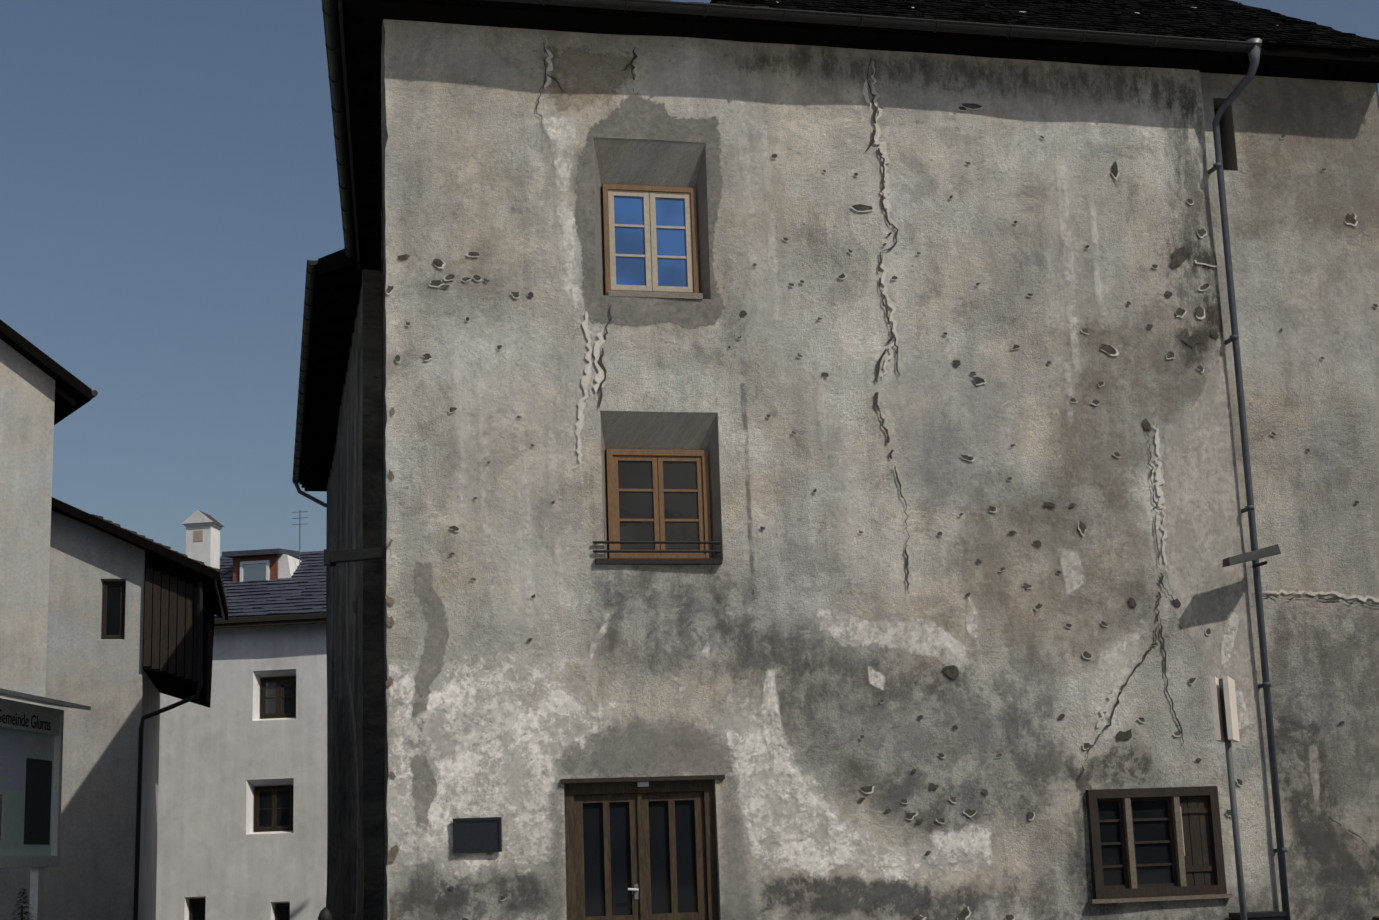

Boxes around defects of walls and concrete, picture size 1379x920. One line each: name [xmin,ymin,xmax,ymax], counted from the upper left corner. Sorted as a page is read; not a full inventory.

flaking render [542,47,632,329]
crack [574,304,612,471]
crack [862,58,910,593]
flaking render [383,648,619,890]
flaking render [723,680,992,881]
damp [763,875,976,920]
flaking render [868,666,885,704]
flaking render [816,593,978,679]
damp [1069,746,1152,900]
crack [1078,419,1184,779]
crack [1253,589,1379,607]
damp [1277,718,1379,920]